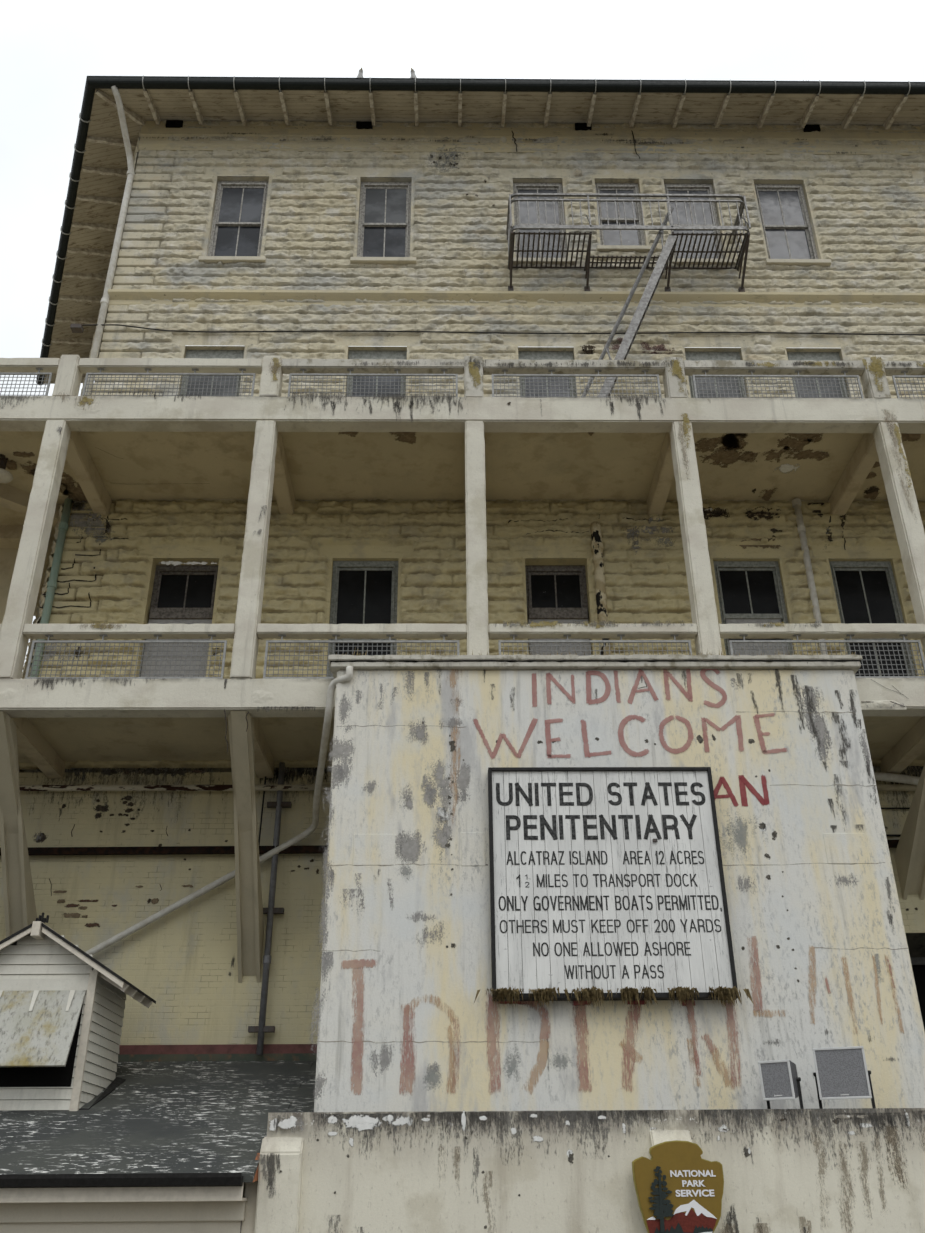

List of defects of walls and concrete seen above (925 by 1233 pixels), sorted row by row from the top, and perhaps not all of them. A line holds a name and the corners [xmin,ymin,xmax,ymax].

peeling [0,452,37,476]
peeling [694,433,829,473]
flaking render [703,507,729,520]
flaking render [735,488,783,549]
damp [379,671,461,709]
spalling [94,795,140,833]
damp [257,690,365,1049]
damp [407,912,443,944]
peeling [269,1115,304,1131]
peeling [316,1114,430,1158]
peeling [461,1111,487,1139]
damp [690,1108,925,1233]